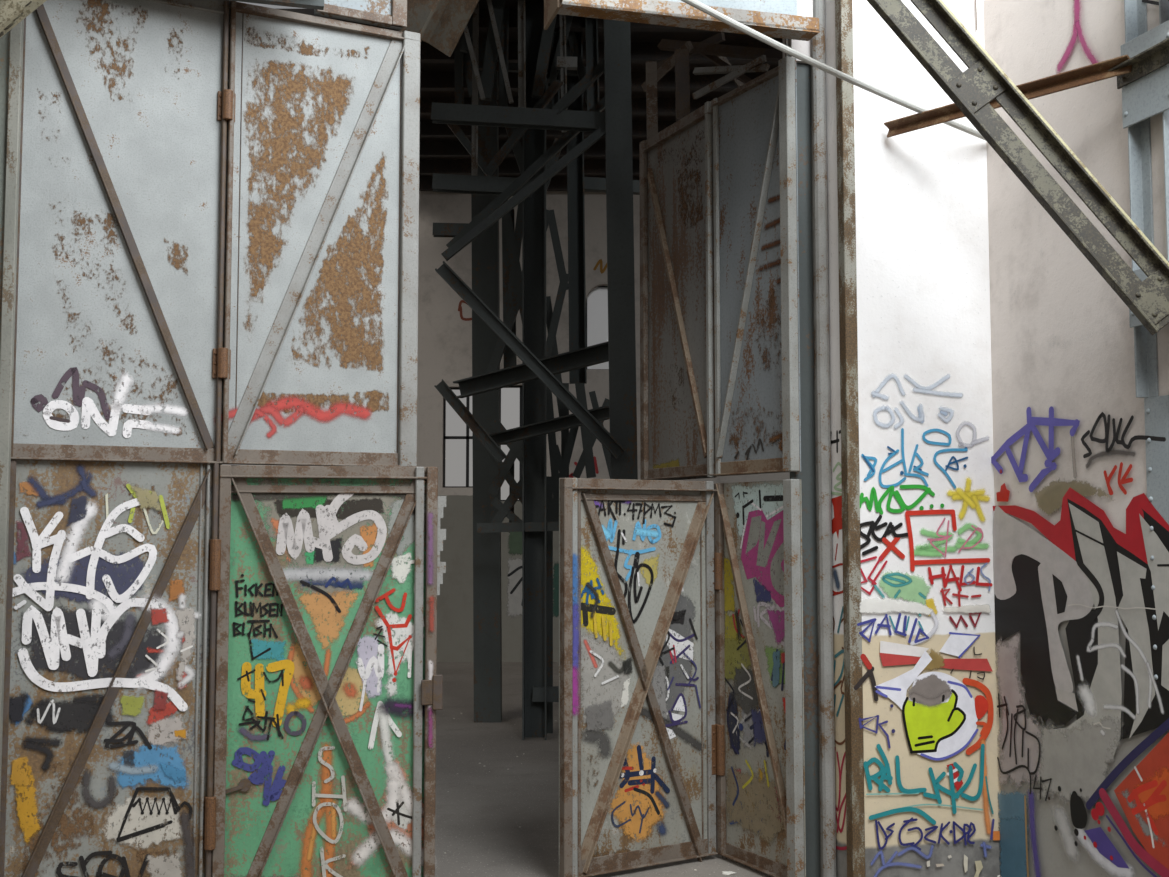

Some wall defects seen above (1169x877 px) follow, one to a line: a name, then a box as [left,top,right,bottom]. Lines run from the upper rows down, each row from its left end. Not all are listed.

corrosion [77,0,148,101]
corrosion [244,27,369,302]
corrosion [50,204,136,335]
corrosion [164,238,188,273]
corrosion [291,154,388,373]
corrosion [756,240,782,378]
corrosion [48,346,187,436]
corrosion [729,407,783,451]